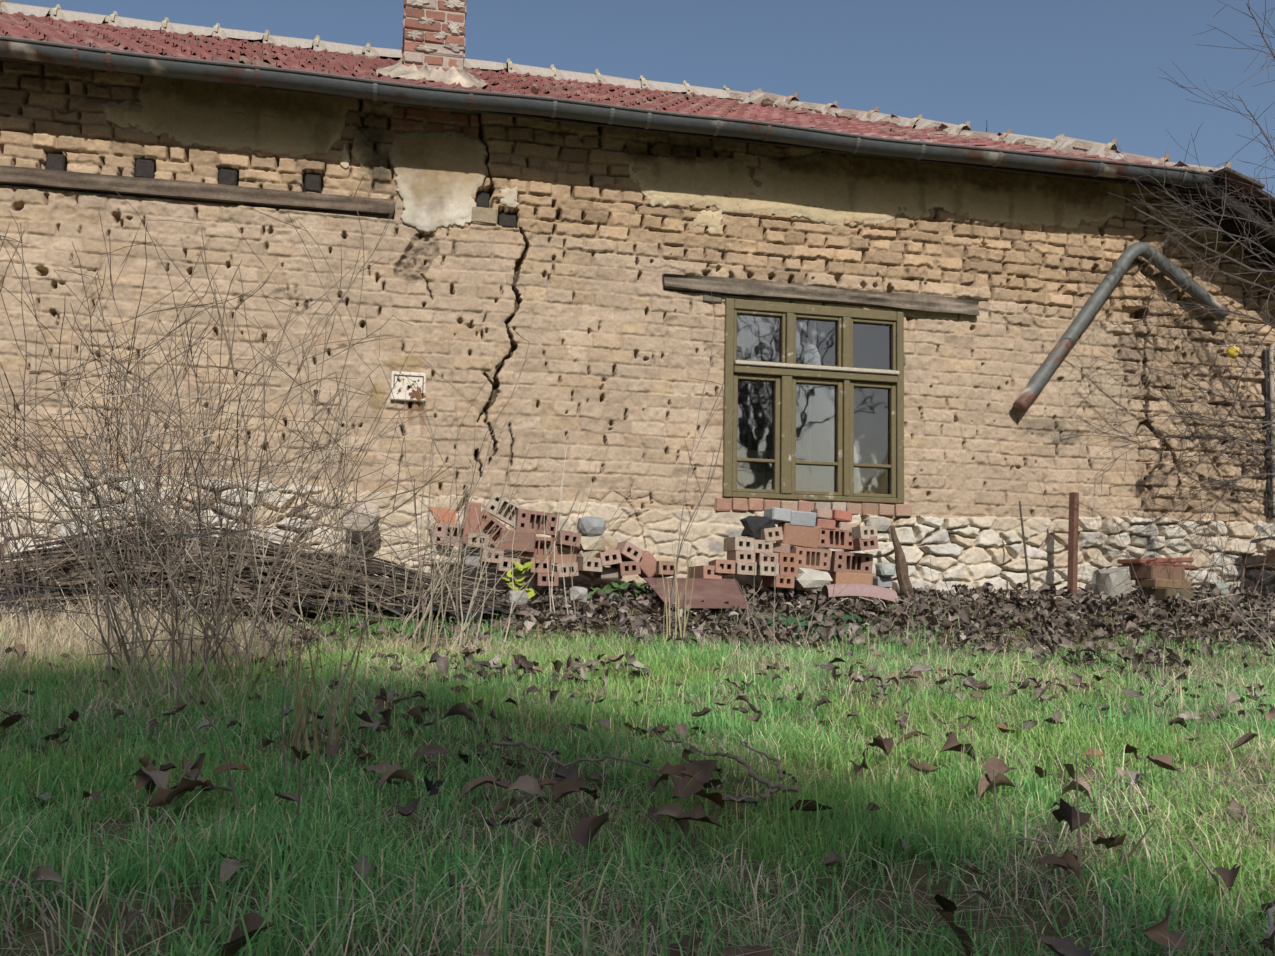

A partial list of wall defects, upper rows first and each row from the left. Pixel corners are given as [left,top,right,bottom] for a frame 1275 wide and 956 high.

peeling [387,130,488,284]
crack [478,113,495,198]
peeling [499,186,519,213]
peeling [623,149,1125,235]
crack [456,227,530,513]
crack [1134,187,1183,497]